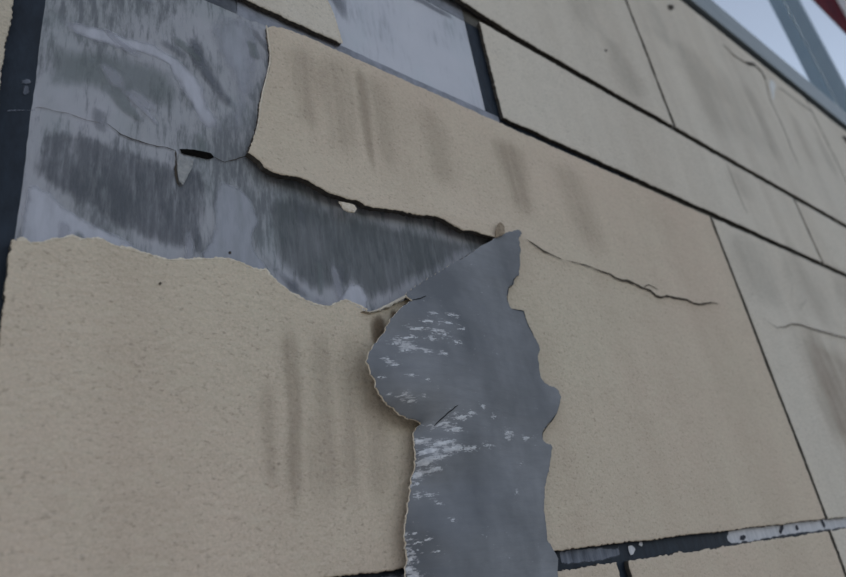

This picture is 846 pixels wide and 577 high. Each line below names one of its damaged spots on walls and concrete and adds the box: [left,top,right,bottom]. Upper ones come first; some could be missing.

peeling [14,0,643,577]
crack [528,240,718,305]